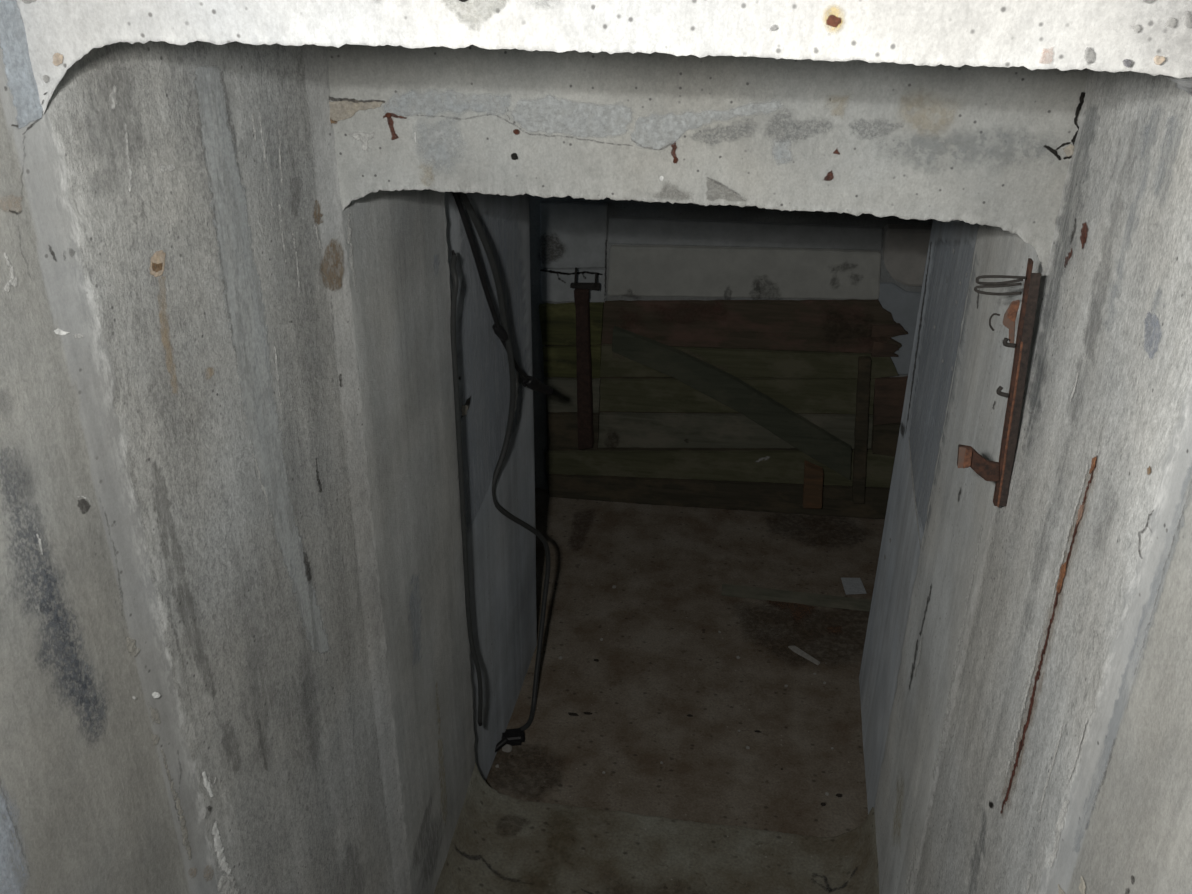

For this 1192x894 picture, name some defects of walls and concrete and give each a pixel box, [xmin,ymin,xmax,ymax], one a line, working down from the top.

corrosion [825,8,842,29]
spalling [1085,47,1094,63]
spalling [1154,56,1192,96]
corrosion [383,113,406,140]
crack [1044,92,1085,160]
corrosion [957,258,1041,507]
leakage [0,459,104,735]